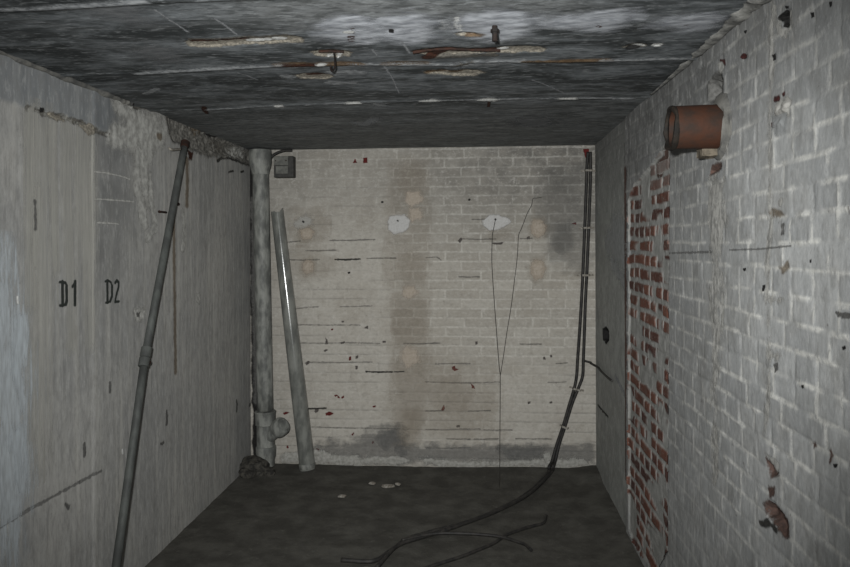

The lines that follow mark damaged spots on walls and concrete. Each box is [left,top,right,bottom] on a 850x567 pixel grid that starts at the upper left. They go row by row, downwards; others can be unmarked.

efflorescence [316,9,646,44]
spalling [186,34,304,48]
spalling [311,49,353,58]
spalling [412,45,546,59]
spalling [707,59,726,104]
peeling [105,99,249,242]
flaking render [624,149,670,567]
efflorescence [281,451,299,463]
efflorescence [313,449,409,466]
water stain [419,452,590,468]
spalling [759,456,789,539]